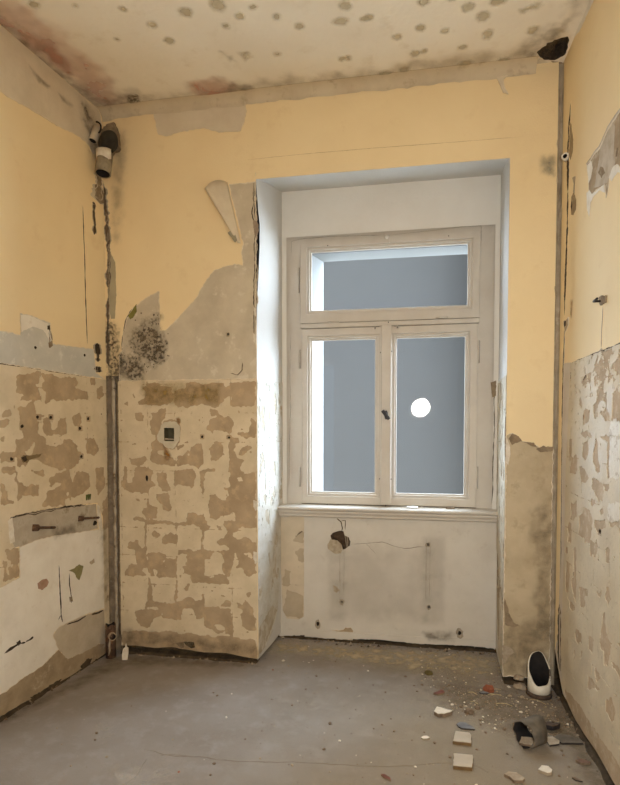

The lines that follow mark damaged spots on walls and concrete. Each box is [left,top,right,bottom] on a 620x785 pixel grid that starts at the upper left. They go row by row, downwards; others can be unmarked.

spalling [536,37,569,64]
peeling [153,105,247,136]
peeling [586,109,620,216]
peeling [0,313,104,379]
mould [105,314,168,380]
peeling [119,180,615,785]
flaking render [0,529,107,722]
crack [125,749,436,785]